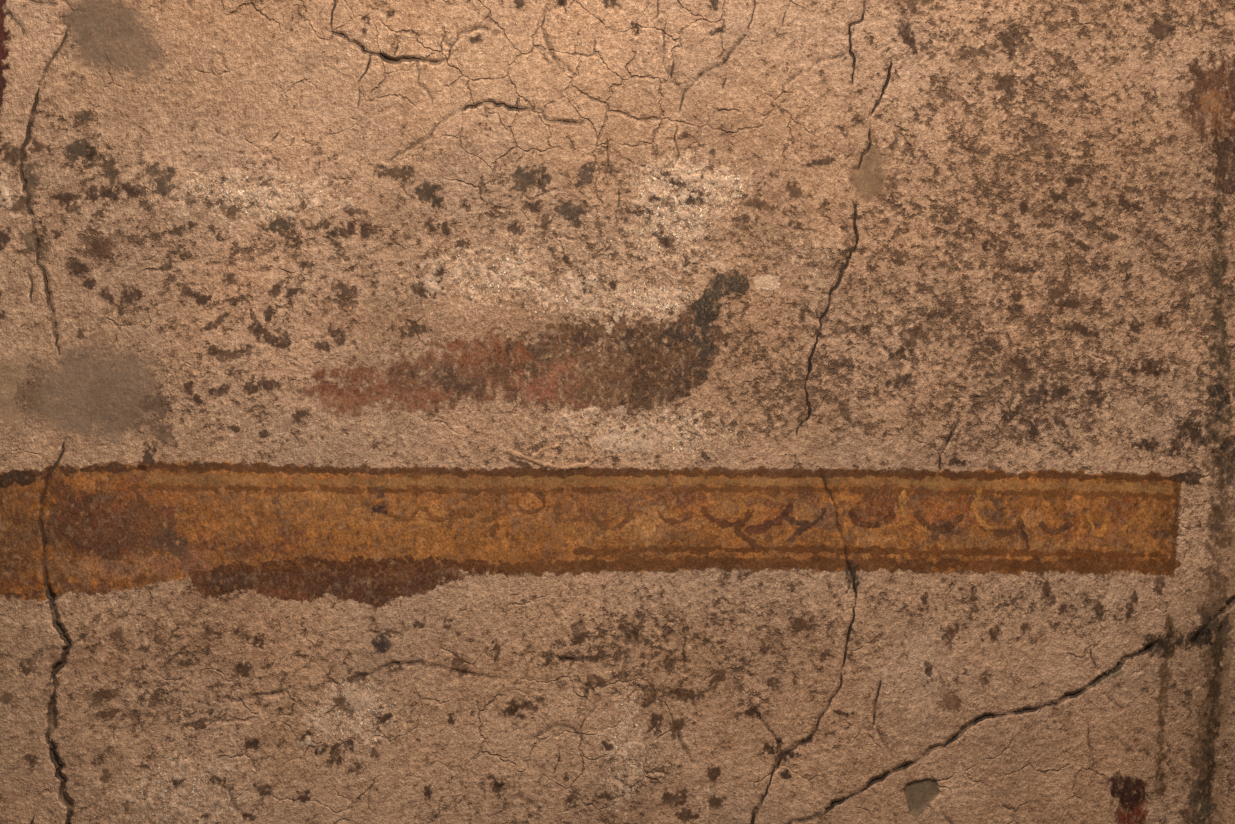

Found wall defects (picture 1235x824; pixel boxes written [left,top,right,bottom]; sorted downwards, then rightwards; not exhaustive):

crack [8,0,68,59]
crack [330,0,584,125]
crack [671,11,754,108]
crack [818,11,865,83]
crack [858,61,892,168]
crack [20,87,61,353]
crack [796,203,859,434]
crack [39,441,72,824]
crack [751,475,857,824]
crack [1189,597,1235,643]
crack [789,645,1154,824]